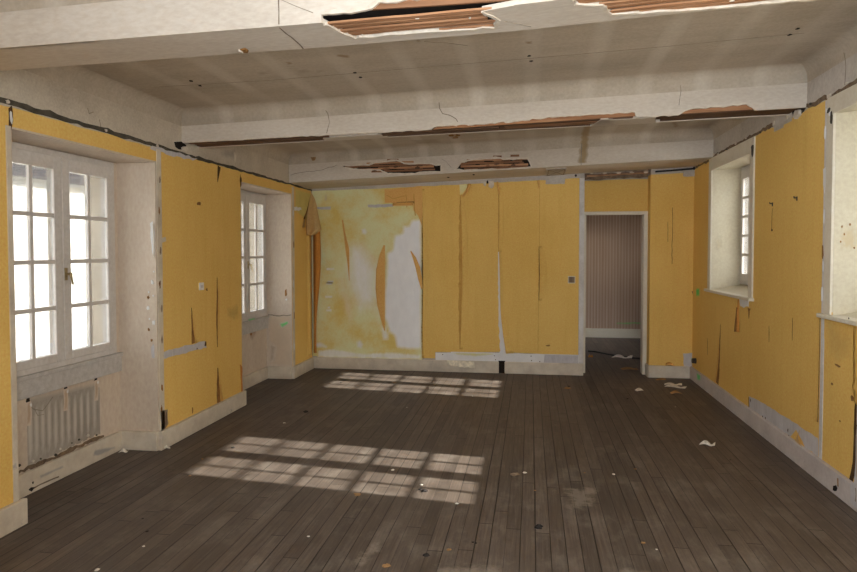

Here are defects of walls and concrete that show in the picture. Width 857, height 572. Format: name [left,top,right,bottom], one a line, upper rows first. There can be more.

crack [278,0,313,49]
spalling [321,0,522,40]
spalling [572,0,817,16]
spalling [0,78,857,191]
flaking render [749,396,818,456]
flaking render [849,404,857,509]